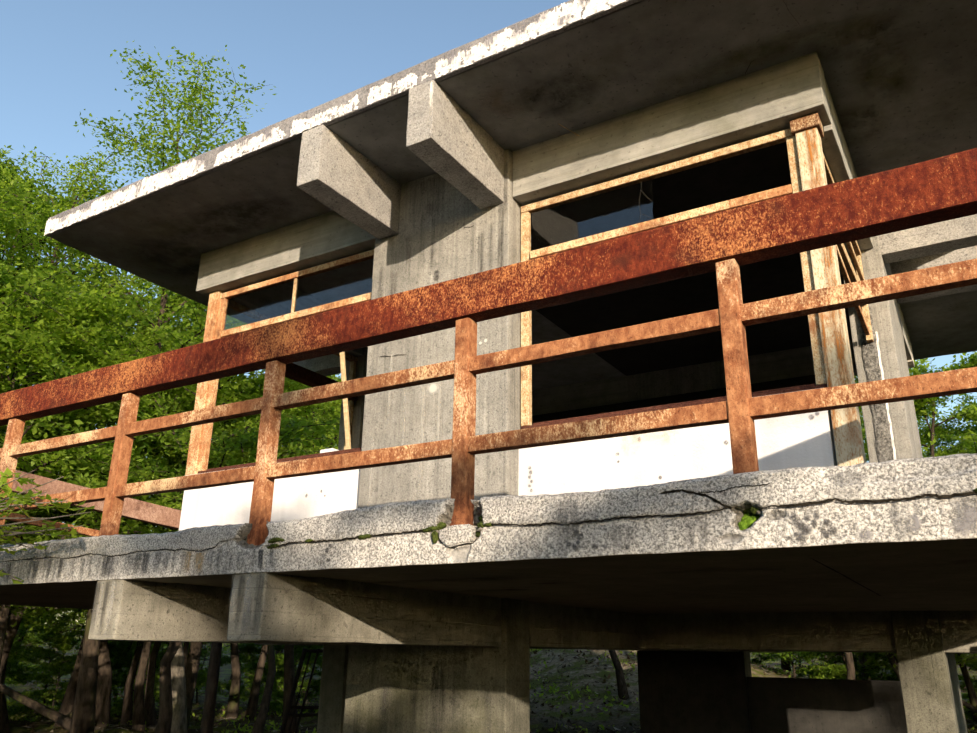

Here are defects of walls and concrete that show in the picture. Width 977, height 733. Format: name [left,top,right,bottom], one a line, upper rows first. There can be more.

peeling [44,0,626,236]
rust [806,129,820,181]
rust [820,309,849,387]
crack [2,540,228,562]
spalling [234,521,269,549]
crack [265,529,423,547]
spalling [434,501,483,561]
crack [483,482,977,526]
spalling [721,503,786,542]